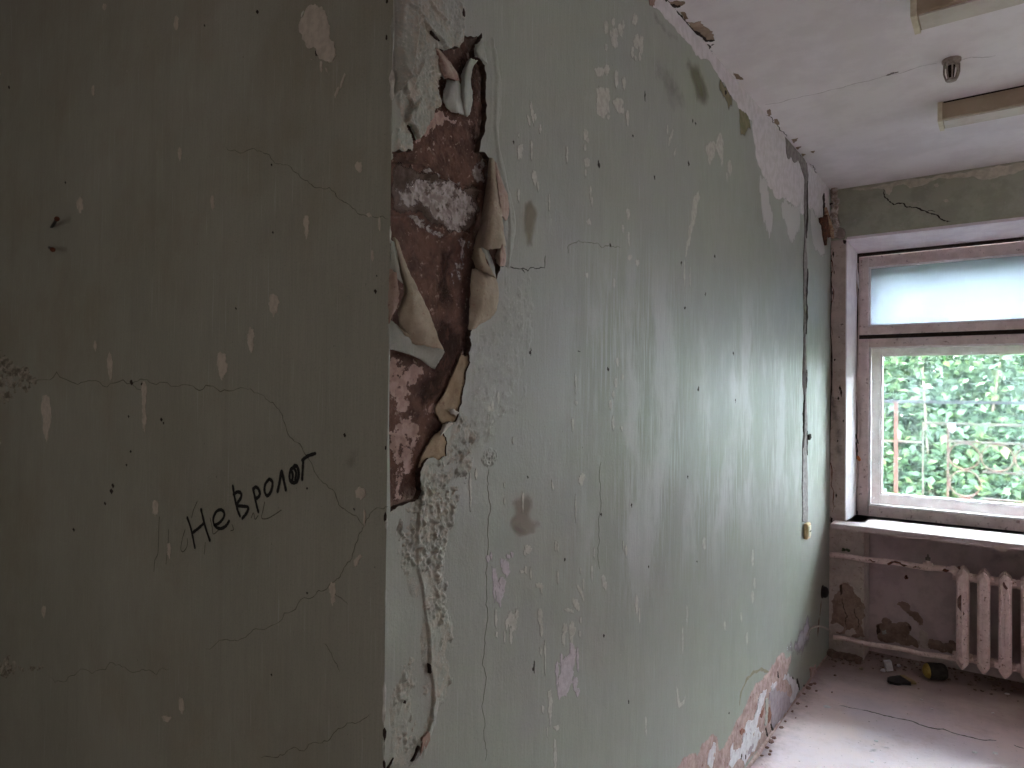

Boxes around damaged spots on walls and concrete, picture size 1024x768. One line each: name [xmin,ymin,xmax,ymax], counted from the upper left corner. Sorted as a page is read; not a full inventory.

peeling [299,4,336,73]
peeling [670,1,715,42]
flaking render [822,188,845,239]
crack [883,190,949,222]
peeling [366,0,520,529]
crack [6,372,388,649]
flaking render [831,583,956,654]
peeling [677,619,810,768]